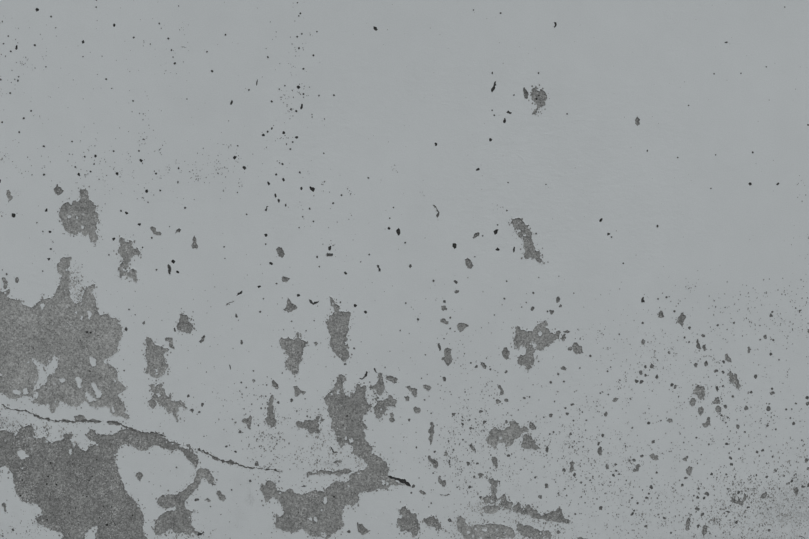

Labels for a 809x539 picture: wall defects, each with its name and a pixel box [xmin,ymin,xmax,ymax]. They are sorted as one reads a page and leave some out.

peeling [523,85,548,115]
peeling [53,184,100,244]
peeling [117,236,142,284]
peeling [510,217,543,264]
peeling [278,331,318,397]
peeling [325,296,352,363]
peeling [501,320,584,371]
crack [1,403,165,438]
peeling [0,256,227,539]
crack [197,447,283,473]
peeling [259,368,432,539]
peeling [456,420,572,539]